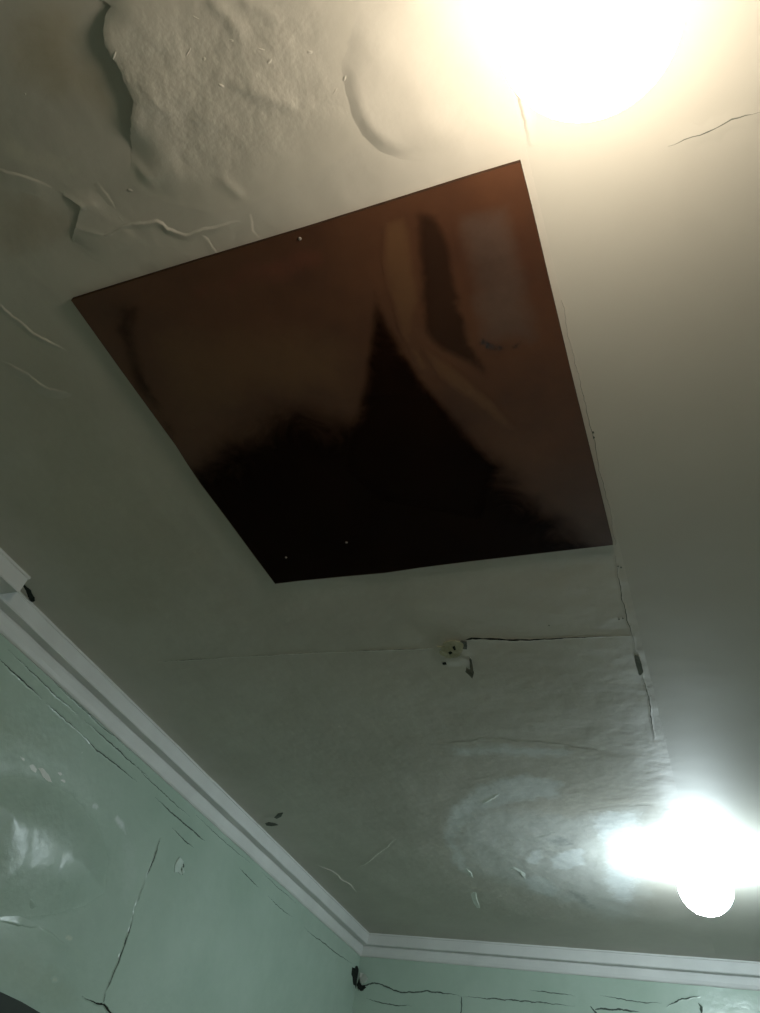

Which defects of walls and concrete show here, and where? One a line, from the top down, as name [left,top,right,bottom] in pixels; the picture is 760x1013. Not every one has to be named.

peeling [58,0,367,263]
crack [667,101,760,156]
crack [464,300,657,740]
crack [0,647,704,1013]